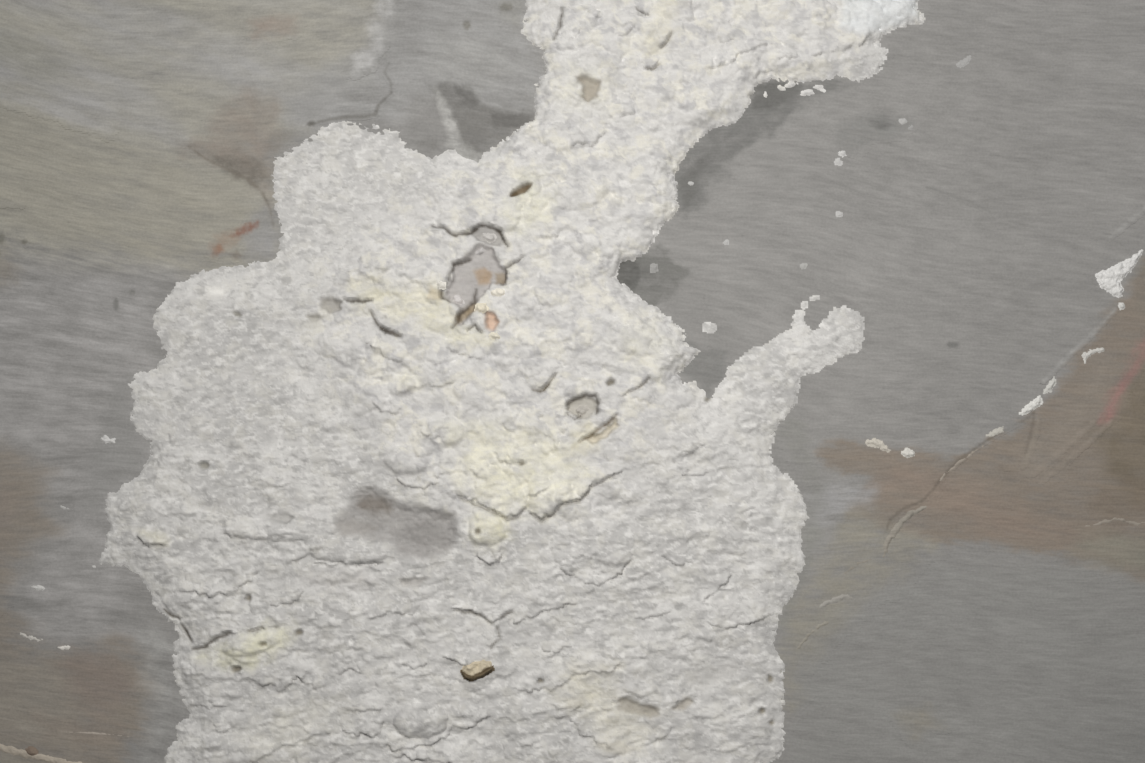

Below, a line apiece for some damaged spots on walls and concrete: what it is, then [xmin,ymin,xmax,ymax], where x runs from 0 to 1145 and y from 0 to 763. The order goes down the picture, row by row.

spalling [424,222,510,333]
crack [429,222,526,335]
crack [340,296,404,339]
leakage [71,0,926,763]
crack [530,372,653,446]
crack [457,472,618,525]
leakage [770,236,1145,763]
crack [162,607,267,652]
crack [451,608,515,652]